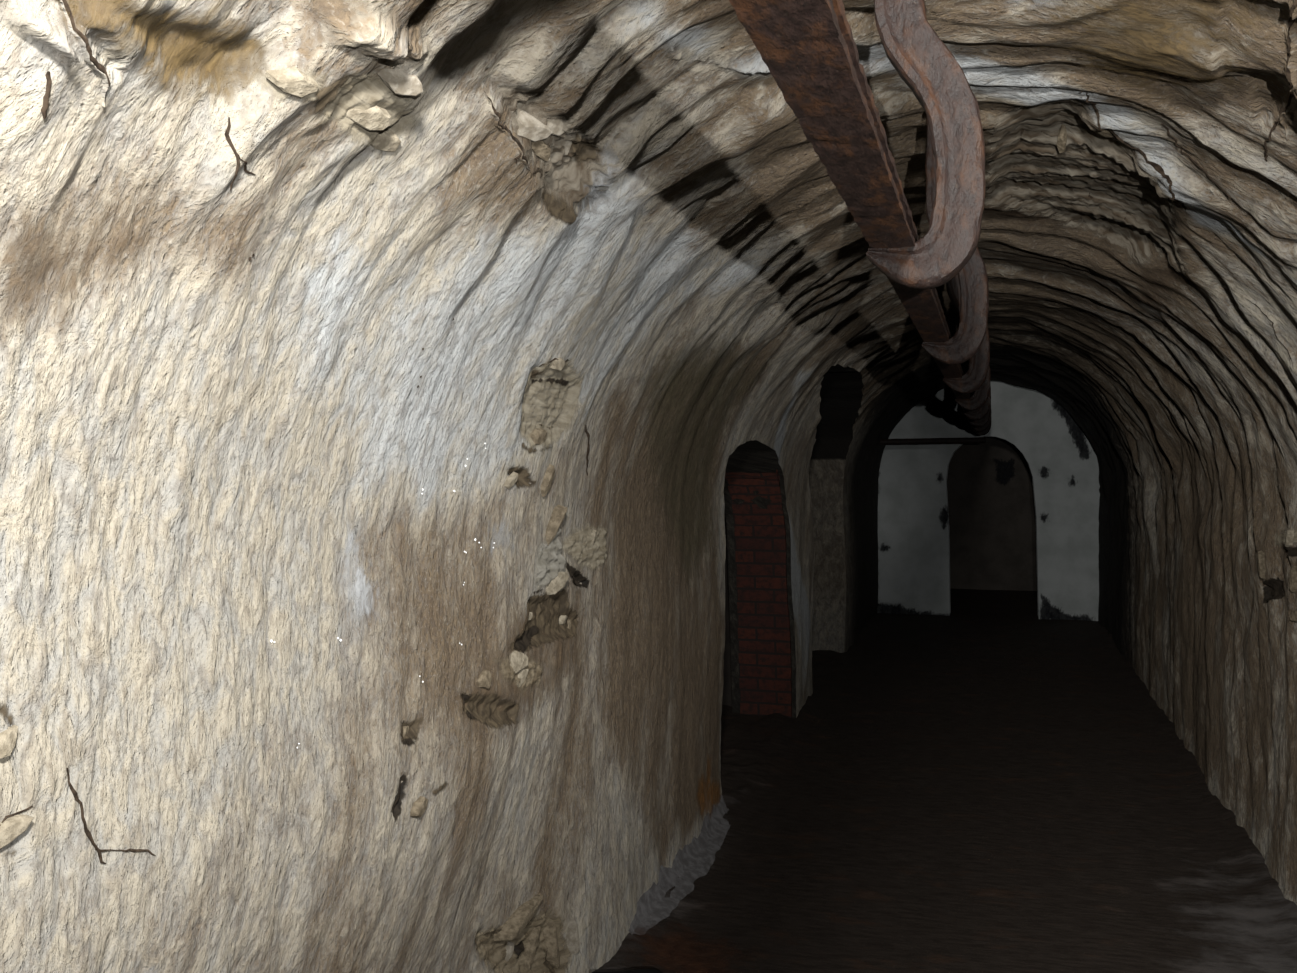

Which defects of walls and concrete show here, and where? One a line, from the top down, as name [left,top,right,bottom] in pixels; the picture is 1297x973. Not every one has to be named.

crack [41,71,52,119]
crack [58,0,111,107]
crack [1264,0,1297,162]
crack [225,117,256,191]
crack [1059,91,1231,210]
crack [1242,295,1296,370]
spalling [461,357,607,728]
leakage [355,569,369,614]
crack [0,806,33,826]
crack [66,768,156,864]
spalling [475,894,580,973]